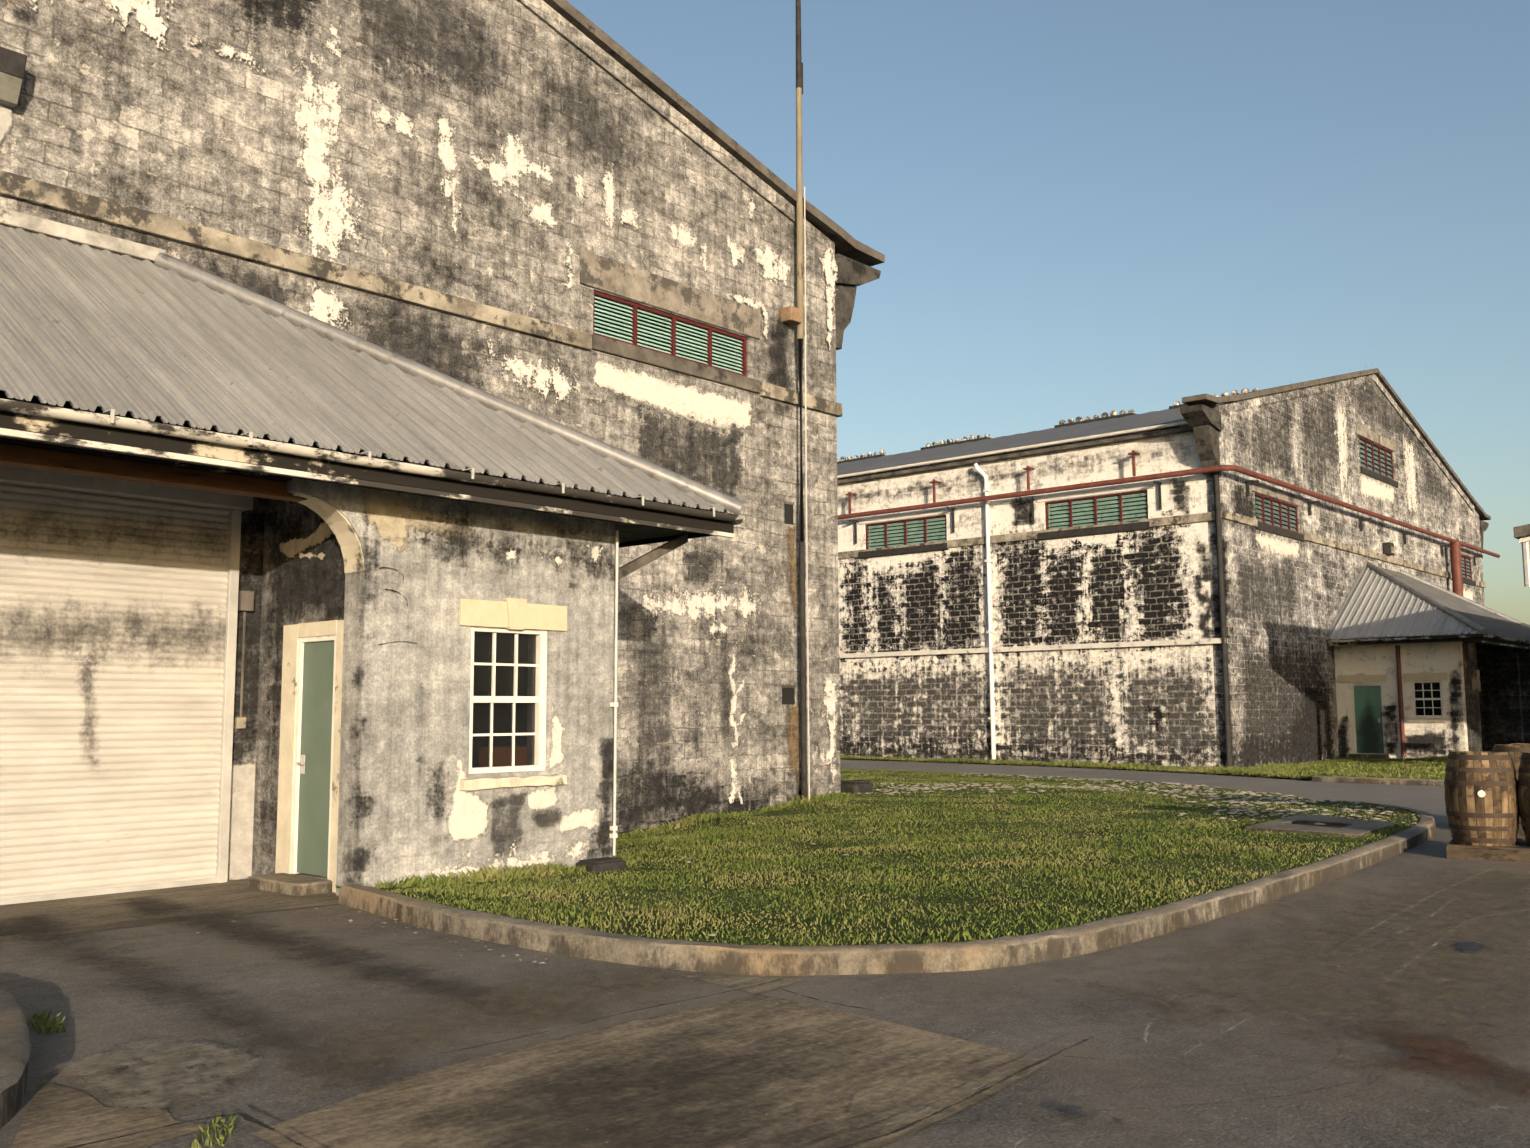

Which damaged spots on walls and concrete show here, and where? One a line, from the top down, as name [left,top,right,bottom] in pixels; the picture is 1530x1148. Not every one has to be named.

water stain [241,0,321,41]
peeling [102,0,559,263]
peeling [573,163,641,230]
peeling [562,241,574,294]
peeling [663,219,711,280]
peeling [726,235,791,290]
peeling [307,281,352,331]
peeling [731,294,770,339]
peeling [484,337,589,412]
water stain [838,383,1463,773]
peeling [447,706,601,857]